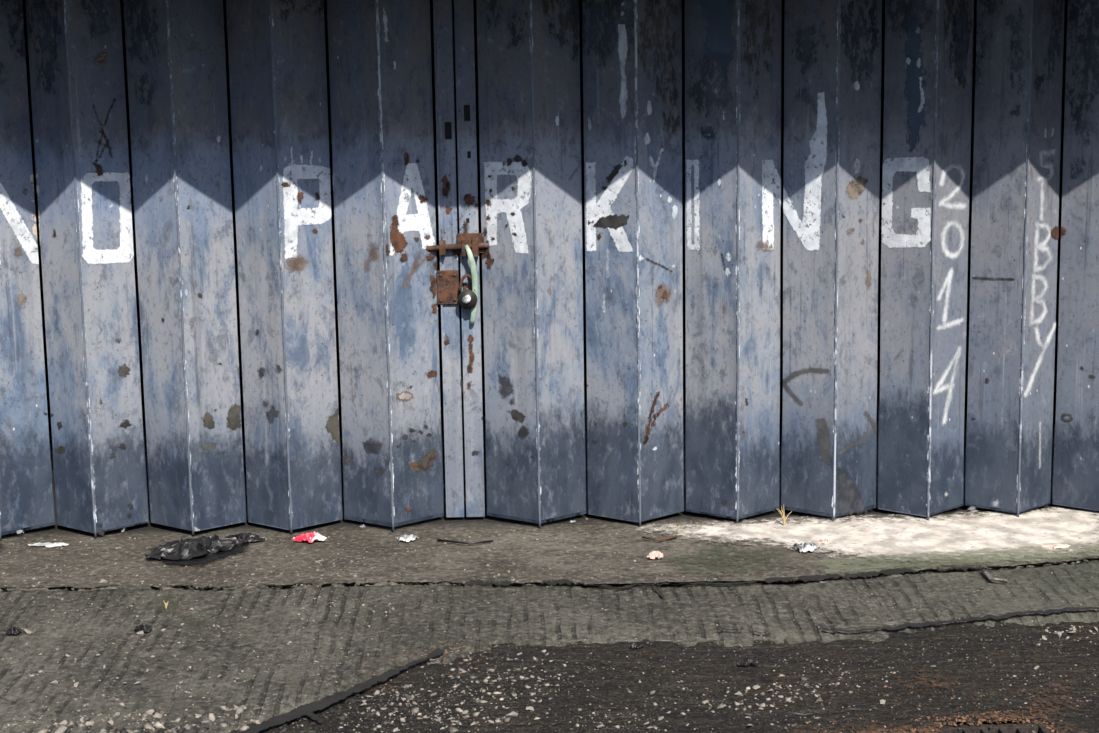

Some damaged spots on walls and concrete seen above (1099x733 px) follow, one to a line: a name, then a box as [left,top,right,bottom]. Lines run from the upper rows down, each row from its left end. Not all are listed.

corrosion [288,257,306,270]
corrosion [365,213,443,314]
corrosion [442,176,452,214]
corrosion [463,189,495,268]
peeling [588,214,629,239]
corrosion [1051,226,1066,239]
peeling [182,360,242,464]
water stain [0,434,444,535]
peeling [325,408,340,445]
peeling [363,438,388,476]
peeling [498,374,541,458]
water stain [485,391,1099,524]